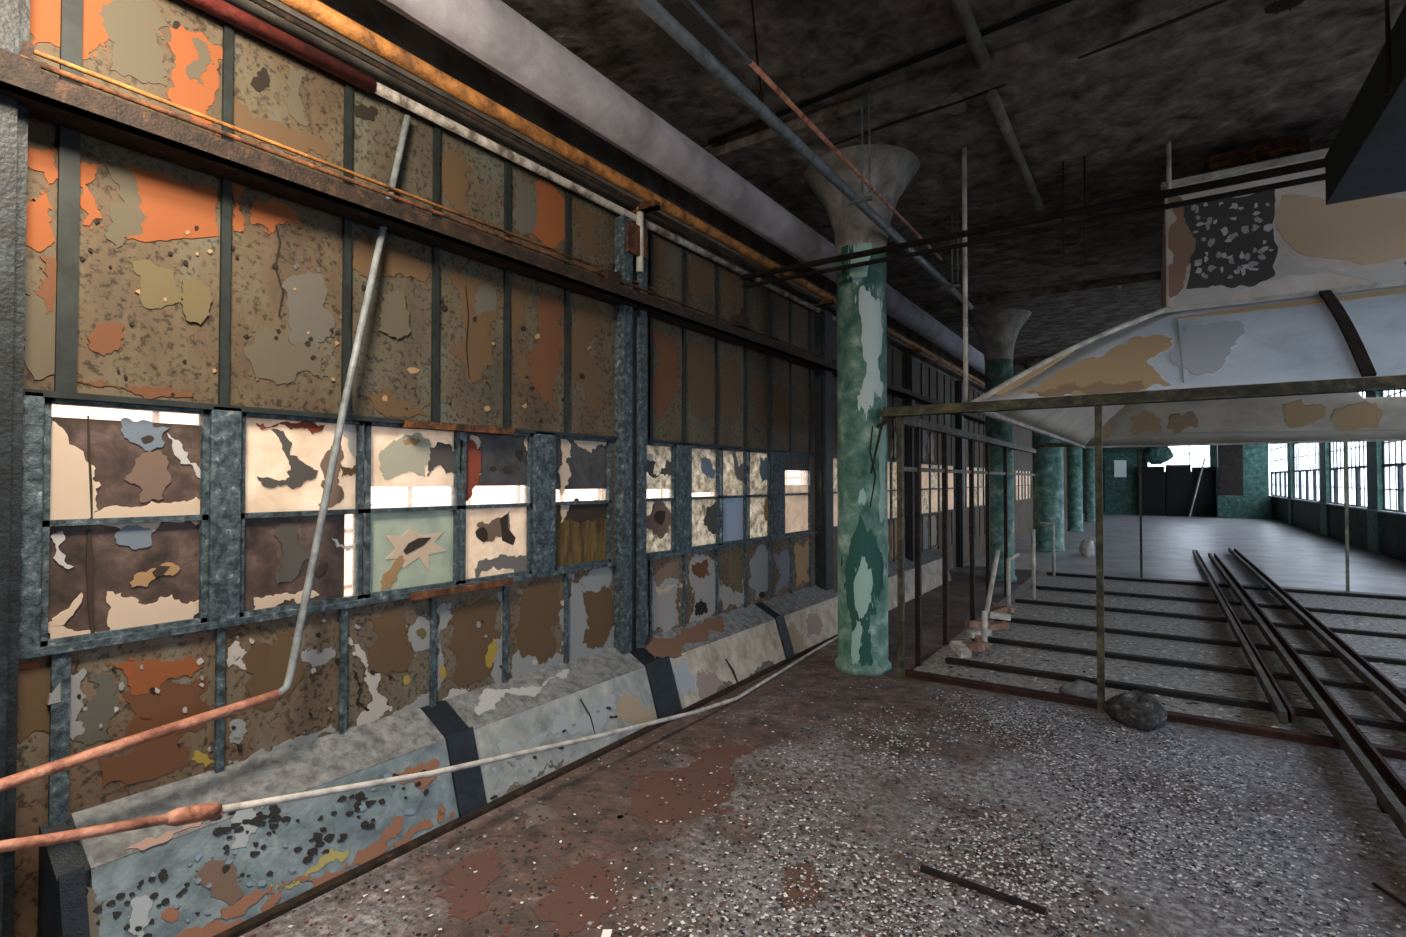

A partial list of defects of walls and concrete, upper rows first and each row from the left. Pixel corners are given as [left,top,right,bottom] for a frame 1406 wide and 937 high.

corrosion [82,0,112,60]
corrosion [157,21,223,136]
corrosion [124,163,303,309]
peeling [1184,189,1278,289]
peeling [50,418,200,569]
peeling [256,421,482,508]
peeling [841,242,897,666]
peeling [47,668,87,743]
peeling [301,603,469,726]
peeling [488,567,614,686]
peeling [93,804,300,937]
peeling [580,689,1406,937]